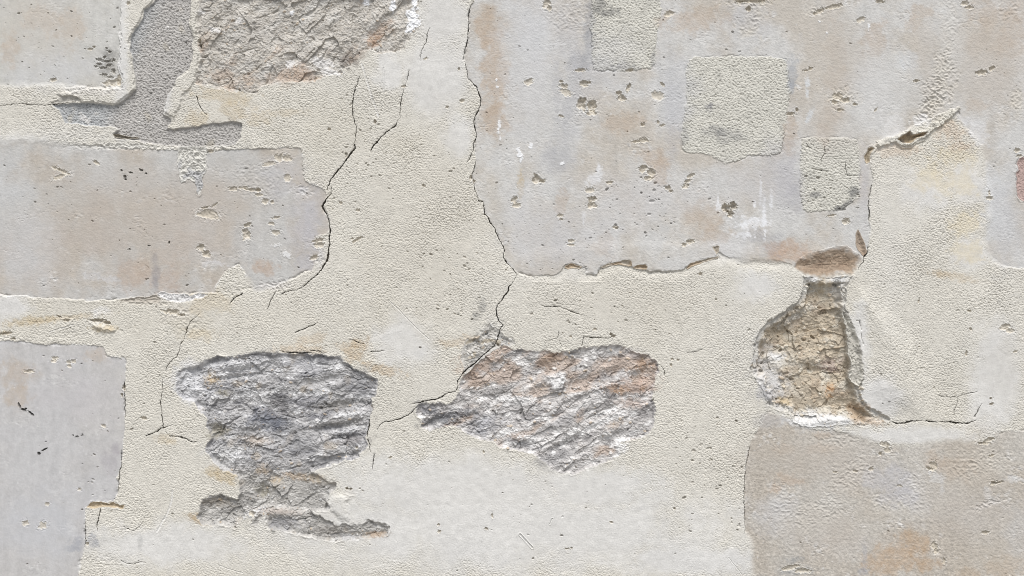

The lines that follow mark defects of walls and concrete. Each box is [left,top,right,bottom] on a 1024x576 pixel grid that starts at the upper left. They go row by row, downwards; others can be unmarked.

spalling [51,0,423,220]
spalling [175,352,391,542]
crack [267,74,409,309]
crack [367,1,517,468]
spalling [416,323,680,476]
spalling [750,214,891,428]